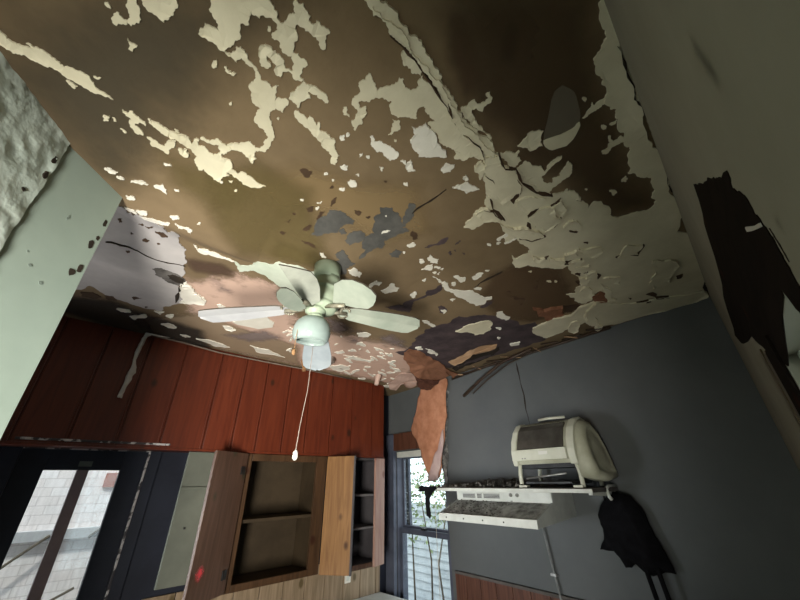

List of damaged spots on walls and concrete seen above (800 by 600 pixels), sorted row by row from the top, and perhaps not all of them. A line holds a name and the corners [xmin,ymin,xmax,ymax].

peeling [0,30,114,100]
crack [390,35,453,119]
leakage [467,0,641,207]
leakage [179,168,424,265]
peeling [69,0,709,387]
crack [412,189,446,214]
crack [468,137,553,221]
crack [105,241,185,303]
spalling [693,171,800,366]
crack [516,363,530,425]